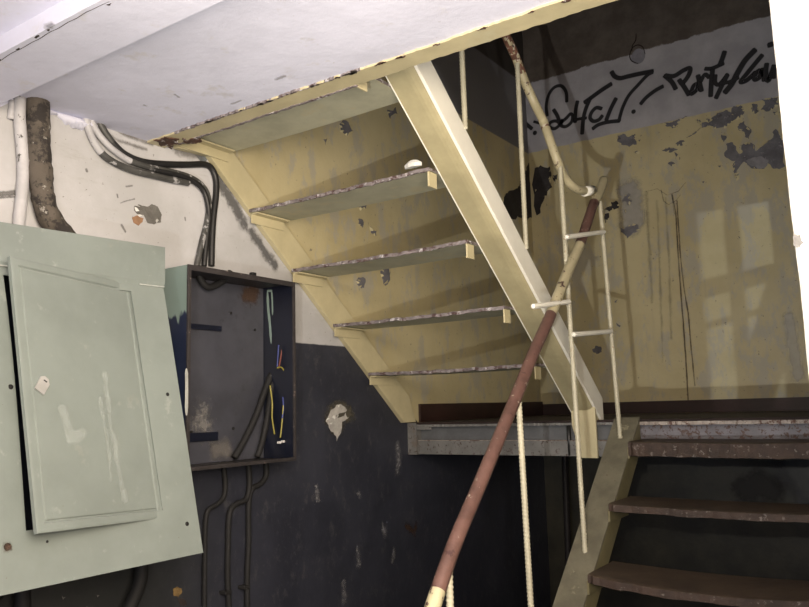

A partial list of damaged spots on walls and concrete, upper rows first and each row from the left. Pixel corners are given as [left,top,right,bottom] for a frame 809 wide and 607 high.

crack [0,2,111,61]
peeling [178,85,358,145]
corrosion [153,136,202,157]
peeling [617,134,640,154]
peeling [660,96,785,181]
peeling [503,163,557,220]
flaking render [132,204,162,226]
peeling [380,269,390,286]
flaking render [325,401,354,439]